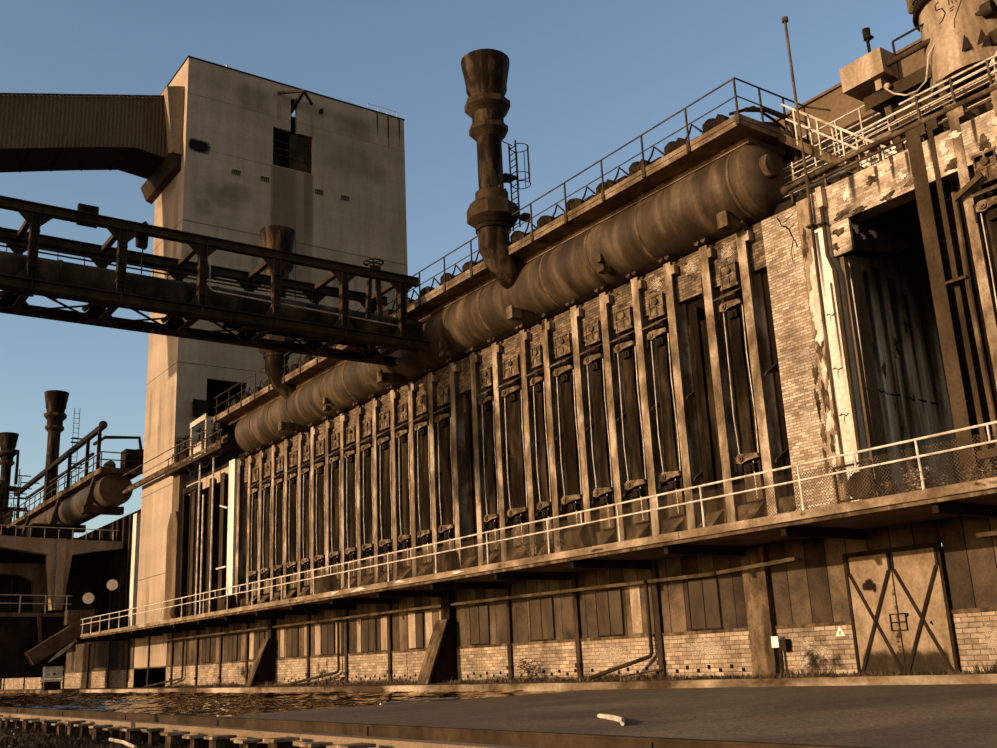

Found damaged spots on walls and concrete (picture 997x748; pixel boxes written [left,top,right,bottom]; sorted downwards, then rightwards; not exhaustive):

peeling [938,130,962,172]
spalling [978,133,991,151]
spalling [866,164,915,202]
crack [776,214,799,264]
spalling [832,183,877,251]
peeling [802,228,844,484]